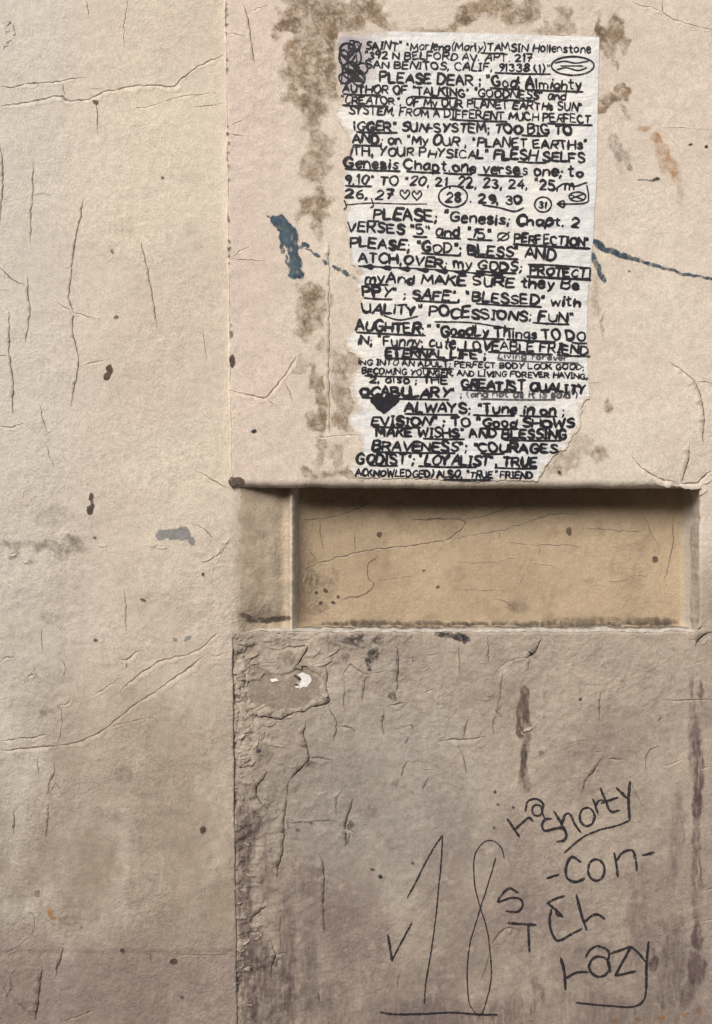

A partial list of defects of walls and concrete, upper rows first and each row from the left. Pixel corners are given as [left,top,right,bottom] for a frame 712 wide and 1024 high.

crack [0,146,51,242]
crack [0,198,110,467]
crack [140,242,157,330]
crack [228,357,297,407]
crack [631,360,712,490]
crack [301,503,675,612]
crack [0,588,542,933]
peeling [235,635,340,786]
water stain [516,687,529,776]
water stain [692,730,704,818]
peeling [234,795,267,1020]
water stain [688,925,706,983]